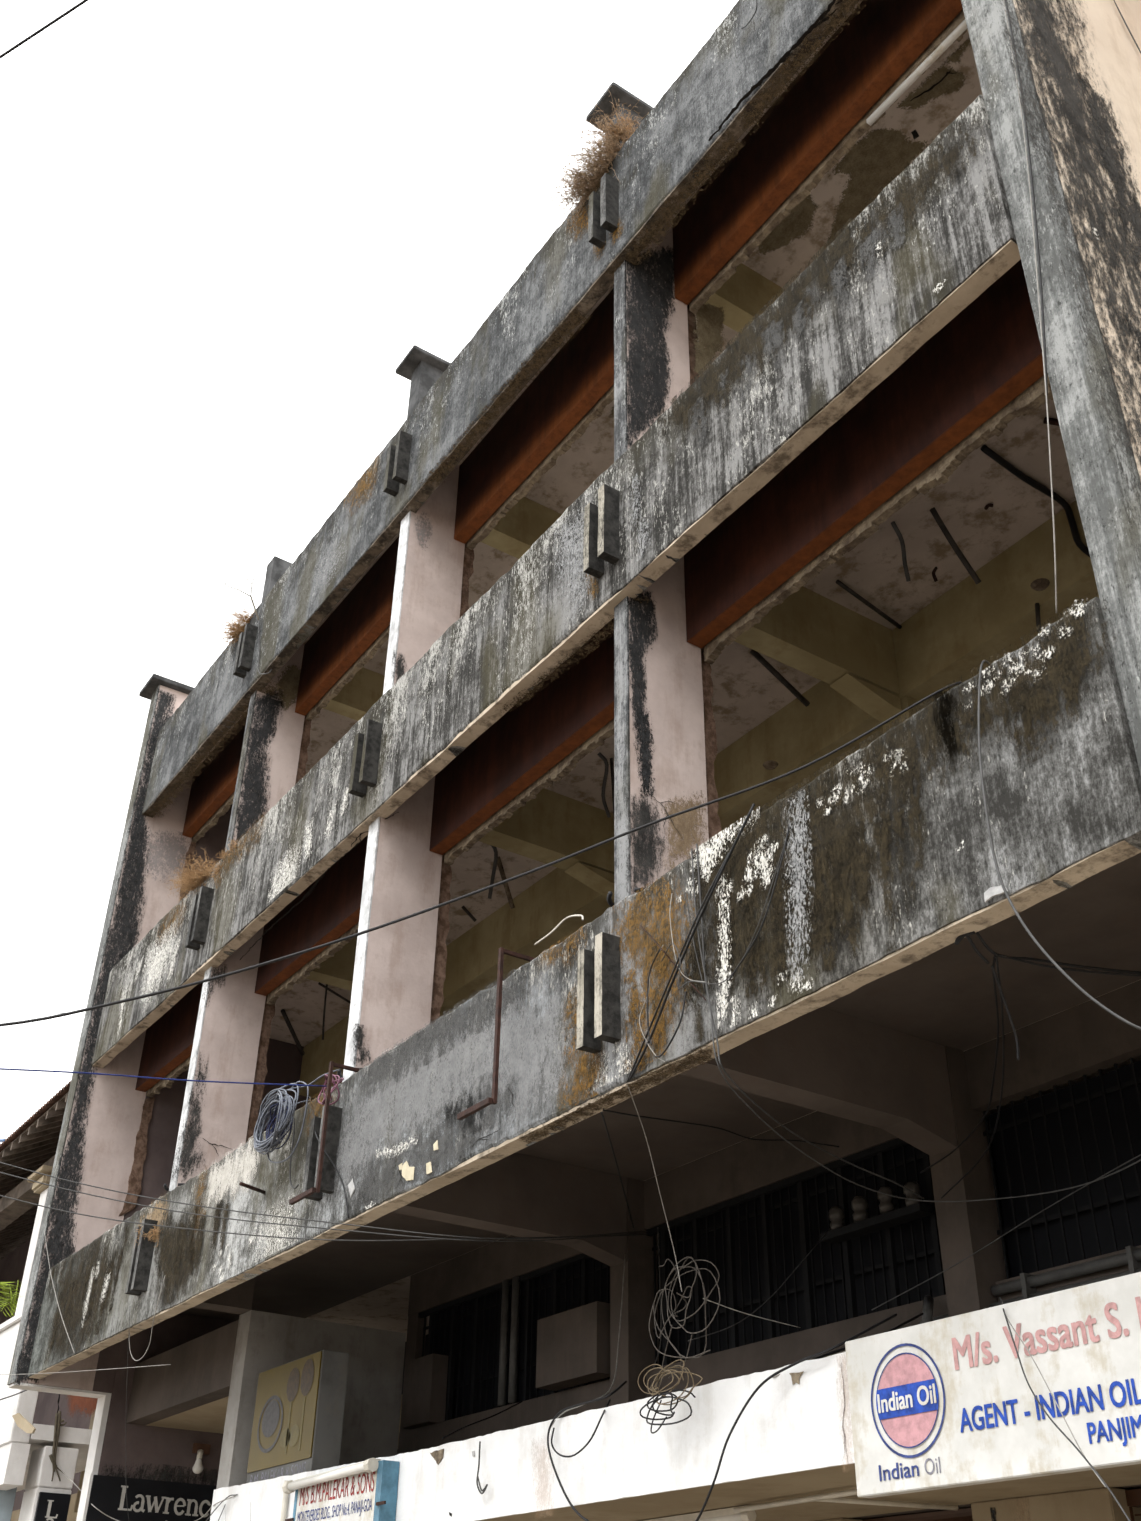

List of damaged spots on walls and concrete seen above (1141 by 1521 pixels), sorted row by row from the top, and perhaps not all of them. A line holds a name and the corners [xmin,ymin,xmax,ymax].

water stain [623,114,990,448]
water stain [997,0,1141,558]
water stain [13,690,229,1385]
water stain [229,688,284,848]
corrosion [536,926,587,967]
water stain [553,509,590,621]
corrosion [557,790,708,1110]
water stain [626,590,669,894]
spalling [704,373,1053,665]
water stain [680,590,1117,1043]
peeling [962,599,1088,707]
water stain [249,1196,300,1262]